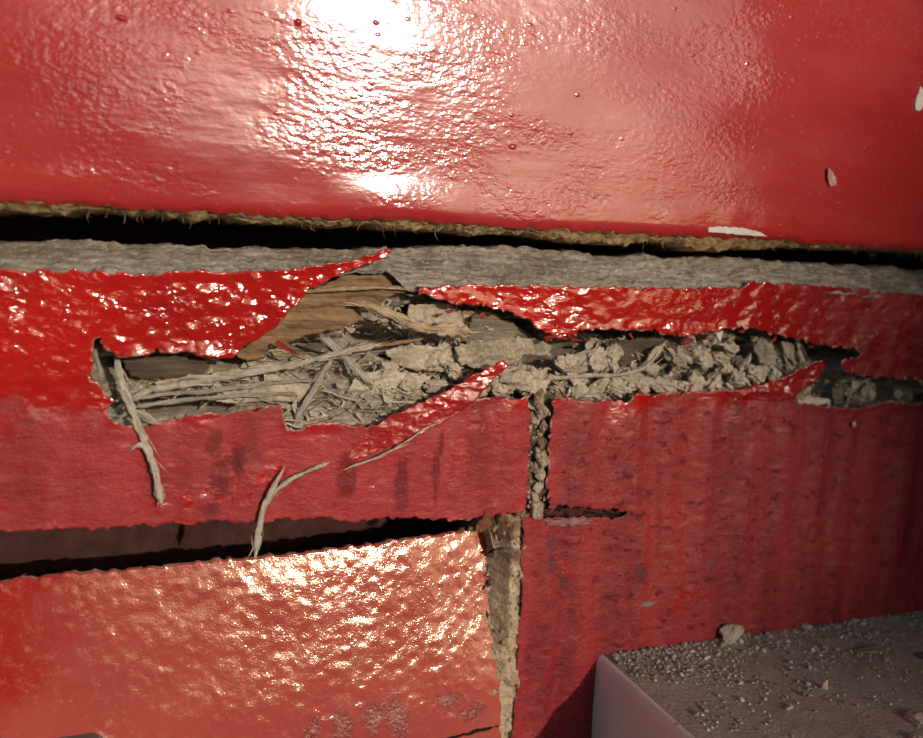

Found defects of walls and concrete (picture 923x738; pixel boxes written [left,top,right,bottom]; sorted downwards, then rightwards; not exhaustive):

peeling [122,248,412,412]
peeling [341,301,694,471]
peeling [724,329,876,407]
crack [521,388,626,527]
crack [448,725,499,738]